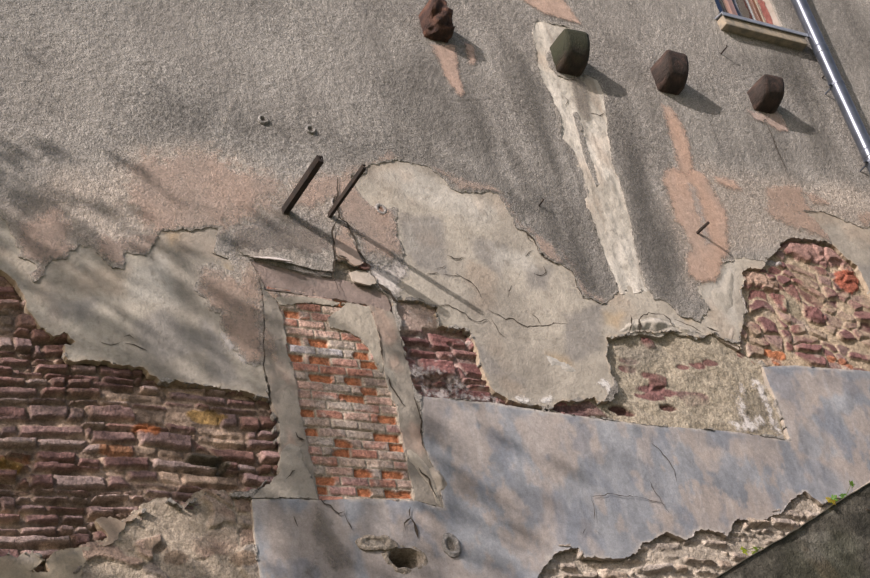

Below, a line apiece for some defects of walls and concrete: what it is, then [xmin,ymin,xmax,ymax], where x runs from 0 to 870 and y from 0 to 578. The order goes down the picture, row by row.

crack [429,255,563,335]
crack [514,223,602,305]
flaking render [297,155,870,439]
flaking render [0,152,280,578]
flaking render [538,493,839,578]